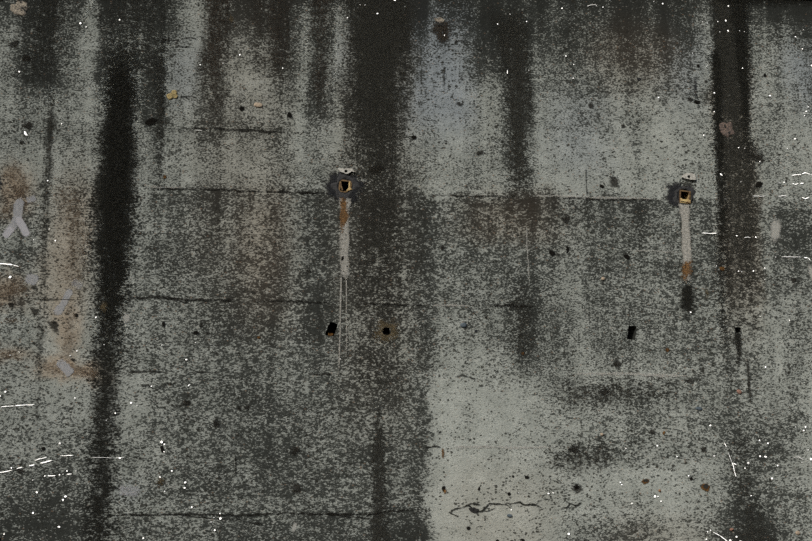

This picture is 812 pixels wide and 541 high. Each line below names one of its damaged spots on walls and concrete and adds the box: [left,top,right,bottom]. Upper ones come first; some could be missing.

leakage [487,7,532,192]
leakage [82,0,180,541]
leakage [308,0,415,392]
leakage [506,284,534,361]
leakage [710,0,760,401]
crack [114,509,425,525]
leakage [369,409,390,541]
crack [448,500,541,517]